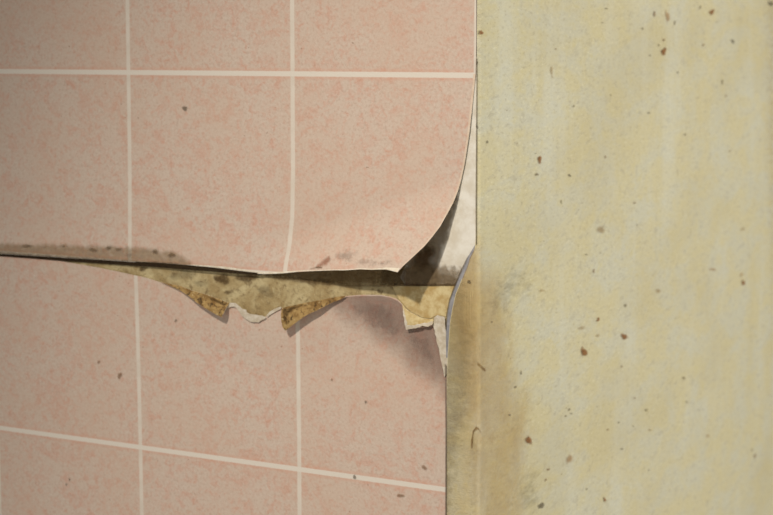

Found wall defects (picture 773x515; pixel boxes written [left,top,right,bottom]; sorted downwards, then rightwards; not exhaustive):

flaking render [63,261,454,331]